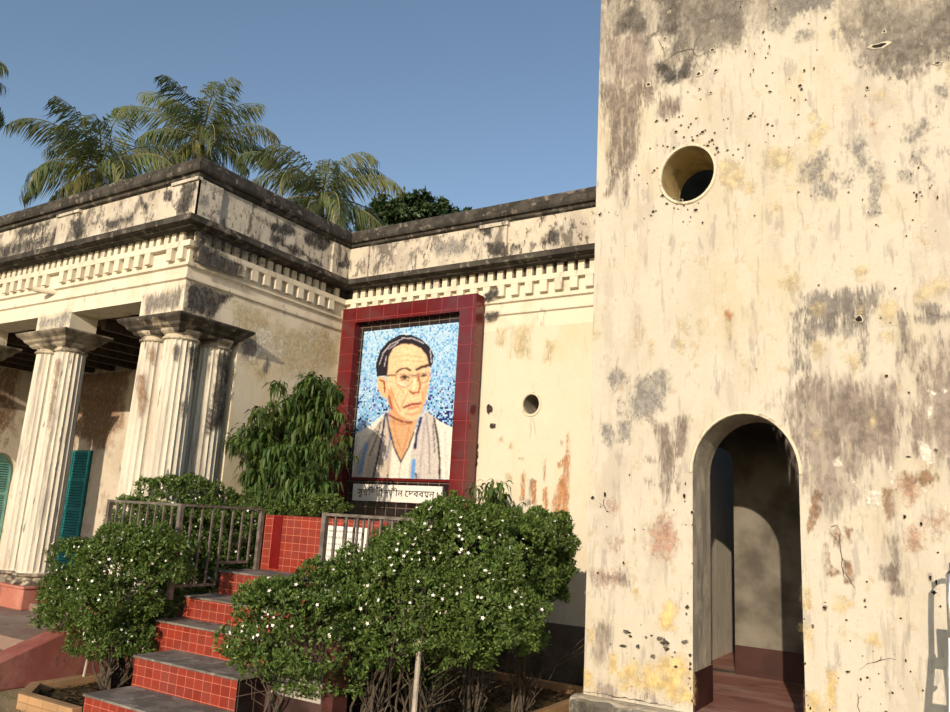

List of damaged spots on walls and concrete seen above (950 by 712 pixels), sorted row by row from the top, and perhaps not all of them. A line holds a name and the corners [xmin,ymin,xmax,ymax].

leakage [599,0,744,196]
spalling [654,115,751,159]
leakage [163,182,220,212]
leakage [192,230,265,277]
leakage [267,221,349,269]
leakage [145,284,233,319]
leakage [206,351,230,435]
leakage [789,287,901,515]
leakage [897,303,950,462]
rust [521,436,569,515]
peeling [906,442,939,464]
crack [831,525,855,588]